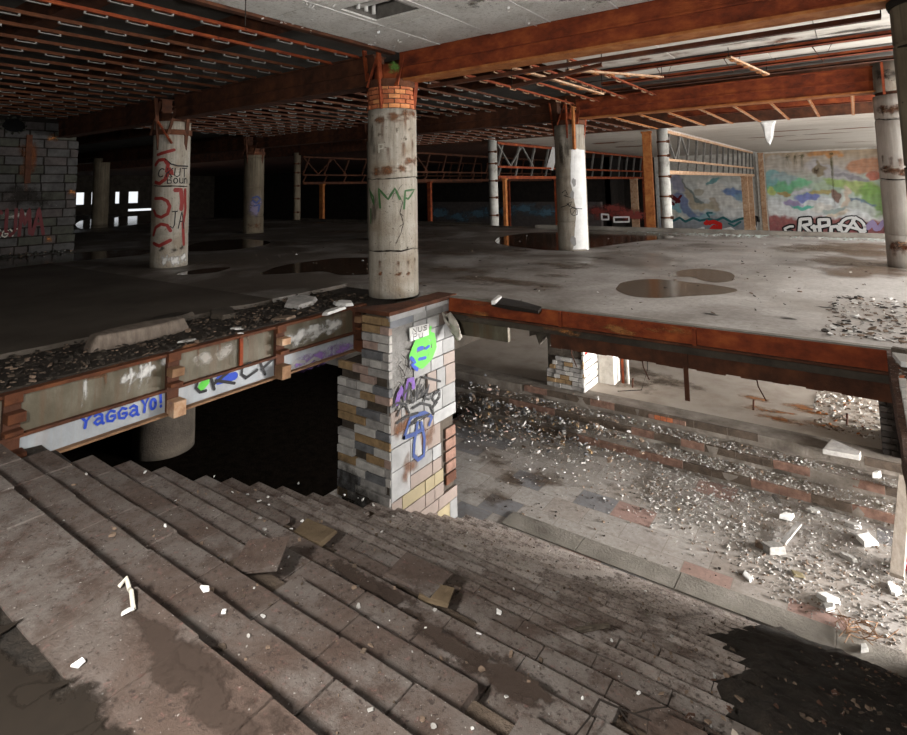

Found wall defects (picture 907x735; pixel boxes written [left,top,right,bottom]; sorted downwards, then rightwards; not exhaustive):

rust [881,156,905,176]
crack [574,698,667,735]